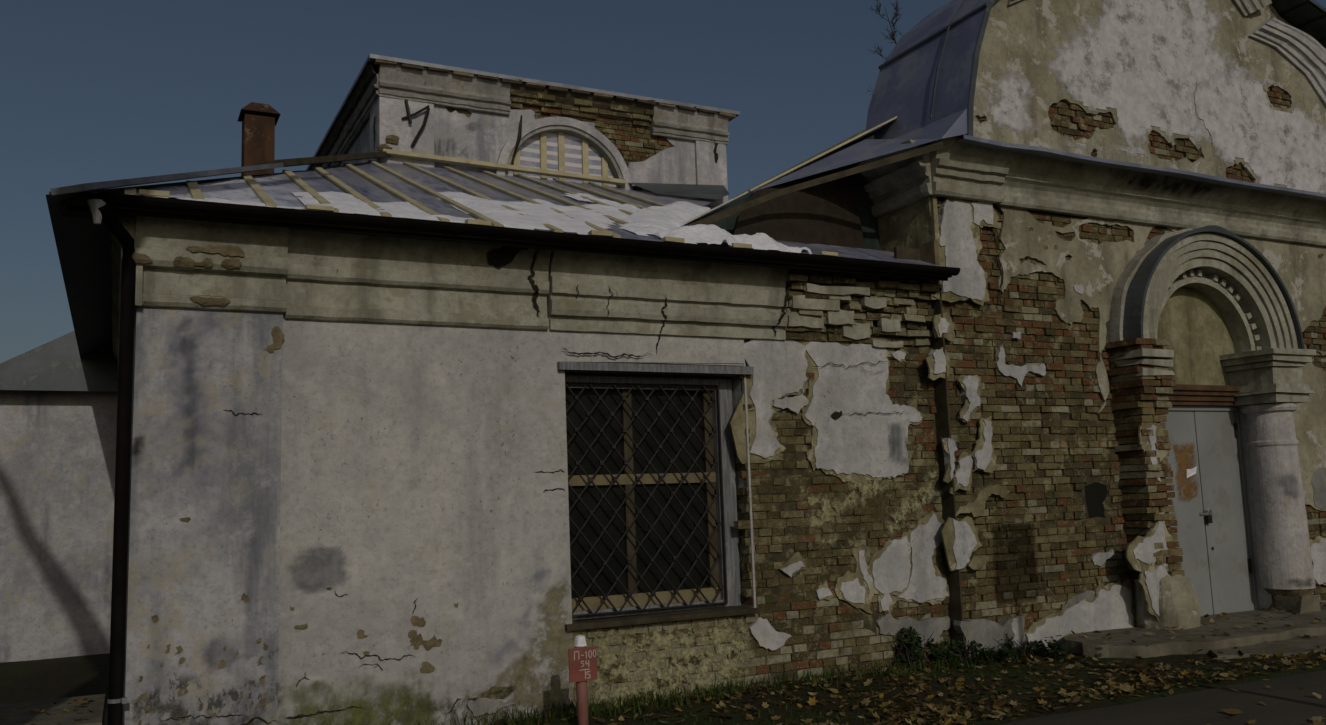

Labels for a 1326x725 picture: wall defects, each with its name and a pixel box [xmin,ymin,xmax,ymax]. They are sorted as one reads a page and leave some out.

peeling [973,72,1032,132]
peeling [1048,0,1326,194]
flaking render [173,245,245,271]
crack [528,249,540,317]
crack [564,297,668,358]
flaking render [1302,306,1326,372]
flaking render [467,197,1172,720]
flaking render [1305,467,1326,603]
damp [294,548,345,591]
crack [343,651,415,670]
peeling [408,616,442,673]
crack [157,677,363,725]